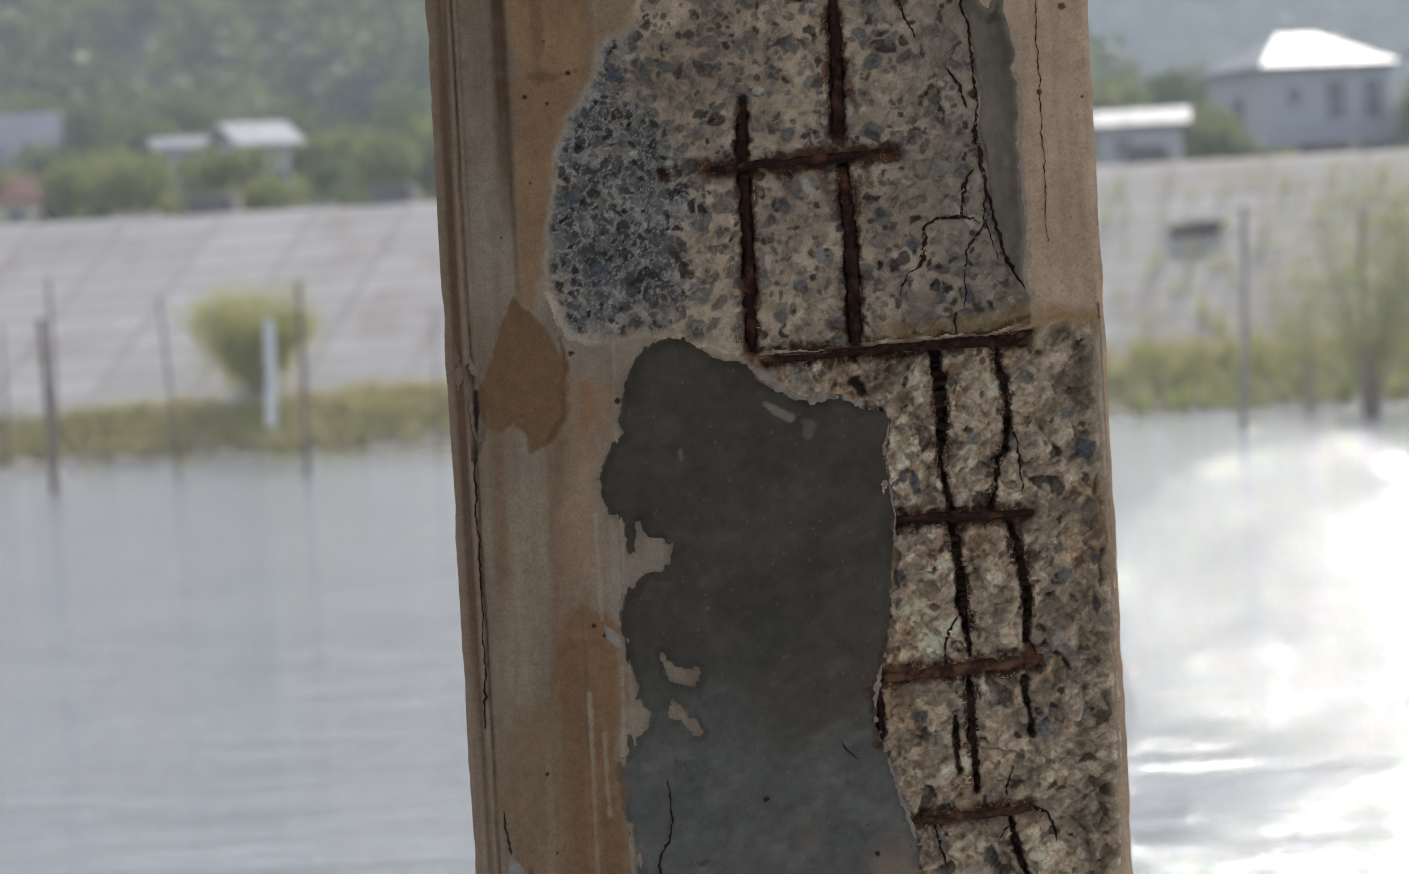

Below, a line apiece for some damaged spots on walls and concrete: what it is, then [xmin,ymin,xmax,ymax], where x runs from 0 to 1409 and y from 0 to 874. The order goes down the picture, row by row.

spalling [544,0,1125,874]
rust [651,0,1100,838]
crack [897,0,915,38]
crack [900,0,1057,874]